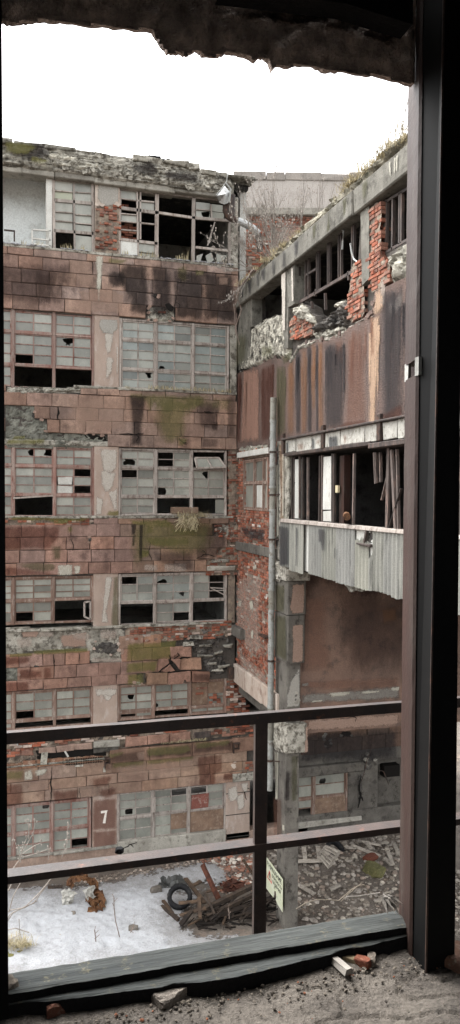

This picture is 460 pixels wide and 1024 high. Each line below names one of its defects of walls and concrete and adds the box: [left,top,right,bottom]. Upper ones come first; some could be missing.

spalling [44,150,221,254]
spalling [271,132,408,262]
water stain [96,256,234,319]
flaking render [281,201,393,364]
spalling [6,405,117,515]
water stain [131,397,144,444]
water stain [132,520,197,558]
flaking render [206,442,270,576]
corrosion [287,343,323,432]
crack [145,652,190,680]